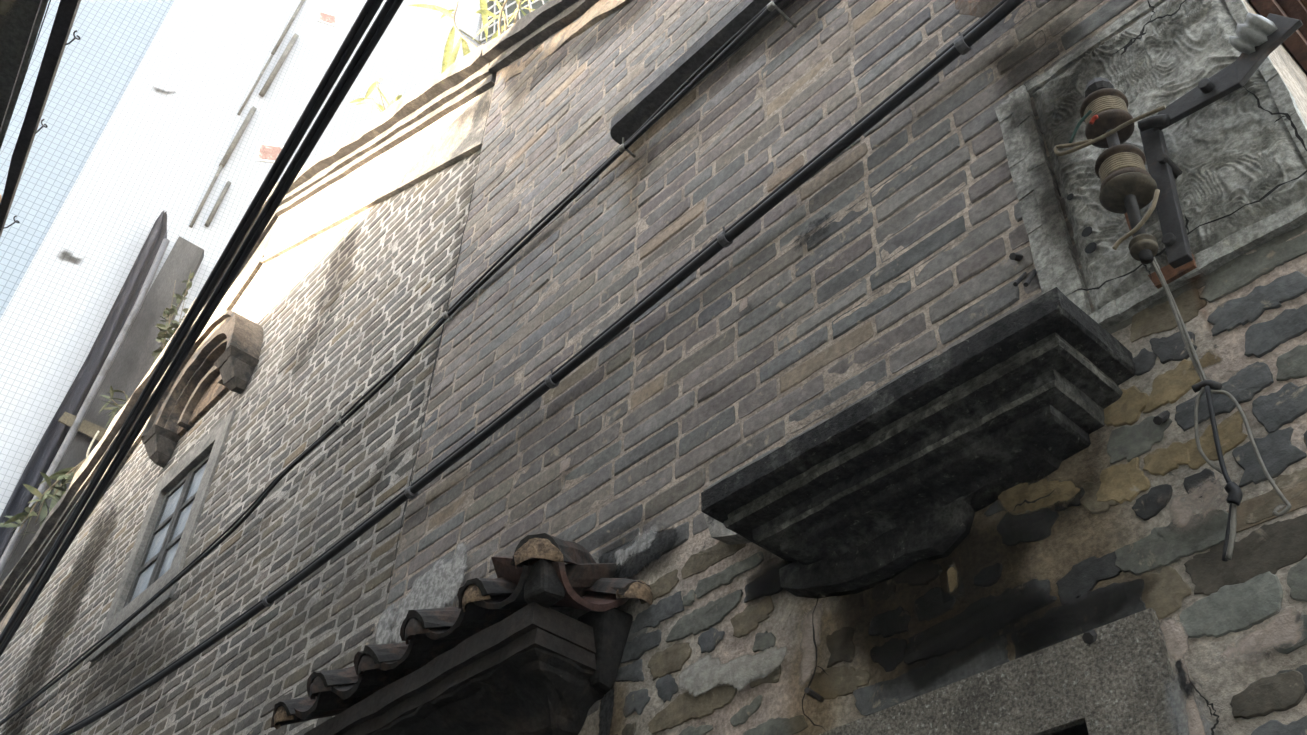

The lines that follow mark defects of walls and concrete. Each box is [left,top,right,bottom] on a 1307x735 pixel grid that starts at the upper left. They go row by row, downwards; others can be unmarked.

crack [1112,0,1186,55]
crack [1072,86,1307,293]
water stain [748,559,792,600]
water stain [843,529,1044,687]
crack [1183,672,1220,735]